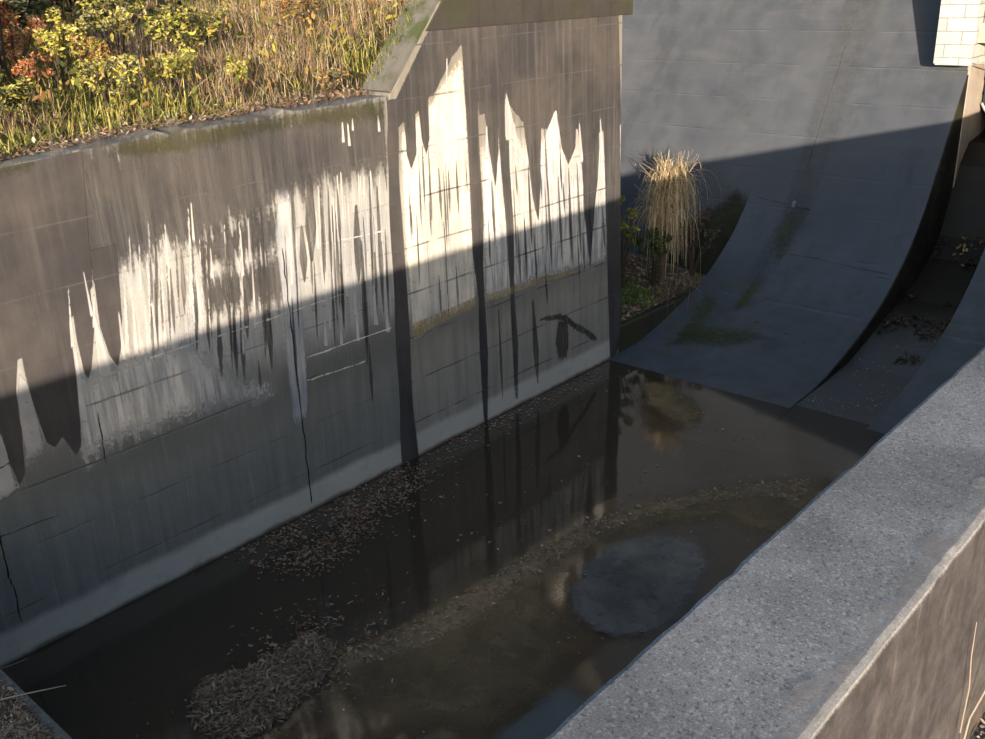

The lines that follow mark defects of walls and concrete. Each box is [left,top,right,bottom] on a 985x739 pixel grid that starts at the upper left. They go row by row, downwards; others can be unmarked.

crack [282,249,312,503]
damp [0,15,621,500]
crack [0,536,22,622]